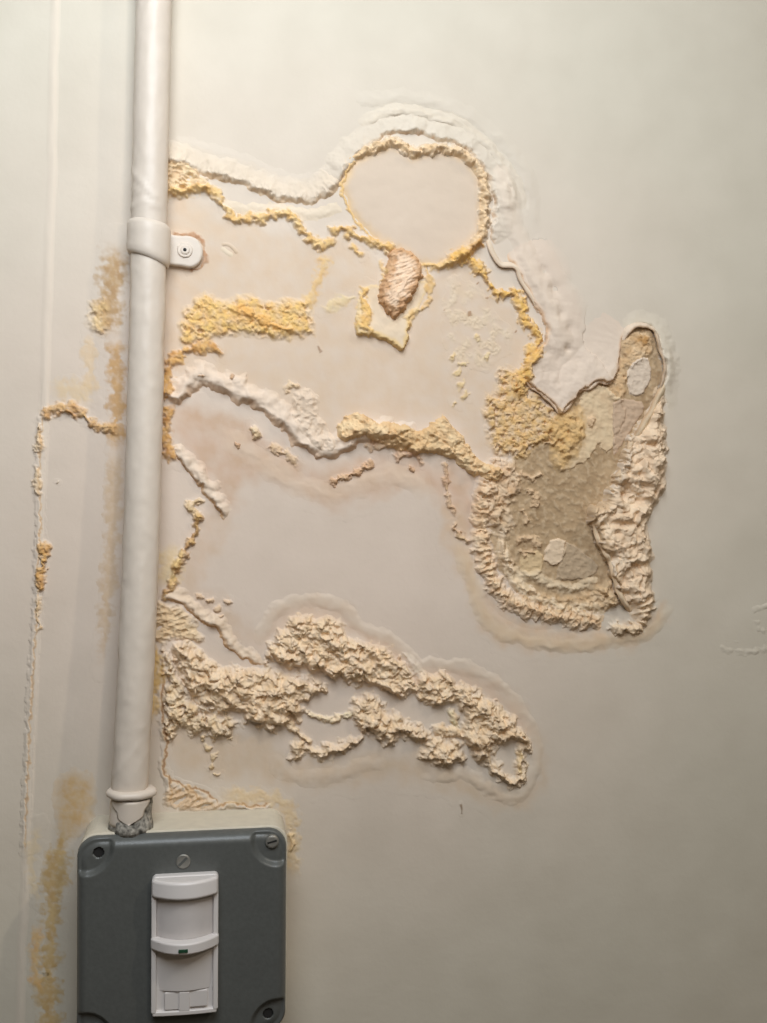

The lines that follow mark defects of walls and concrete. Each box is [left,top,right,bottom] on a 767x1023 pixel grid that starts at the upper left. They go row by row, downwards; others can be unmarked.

leakage [51,766,99,837]
leakage [32,222,130,683]
peeling [156,443,544,806]
peeling [353,247,448,351]
leakage [162,196,681,828]
peeling [438,309,681,654]